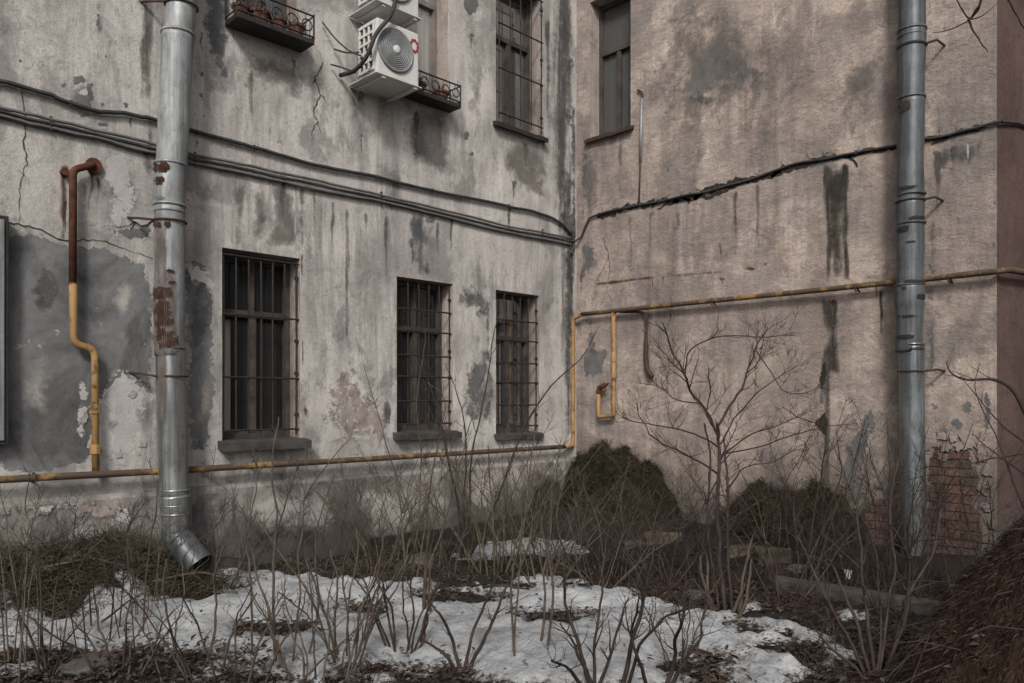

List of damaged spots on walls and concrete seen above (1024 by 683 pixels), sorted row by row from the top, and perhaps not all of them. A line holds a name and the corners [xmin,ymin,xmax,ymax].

crack [9,92,152,258]
crack [311,63,327,142]
crack [593,147,897,303]
damp [824,164,849,278]
crack [927,121,994,145]
peeling [77,381,89,438]
peeling [105,369,146,466]
peeling [321,369,391,445]
spalling [583,334,607,377]
damp [823,300,838,488]
flaking render [925,393,998,557]